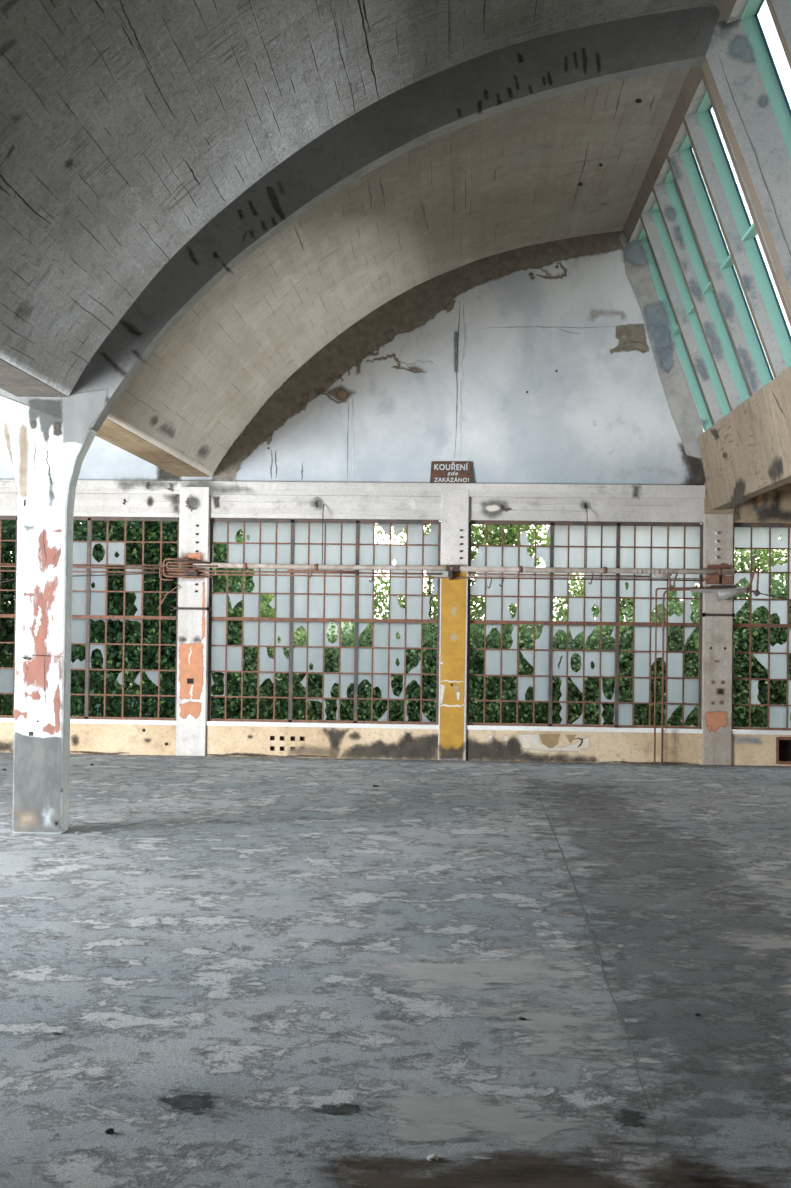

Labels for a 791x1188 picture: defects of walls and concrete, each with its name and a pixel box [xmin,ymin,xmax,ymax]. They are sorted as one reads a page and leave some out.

crack [95,0,173,115]
crack [330,0,380,100]
damp [719,19,753,62]
crack [0,174,51,224]
flaking render [213,231,704,480]
damp [644,301,674,372]
damp [731,460,791,521]
peeling [15,526,62,735]
peeling [179,643,204,719]
damp [207,729,692,764]